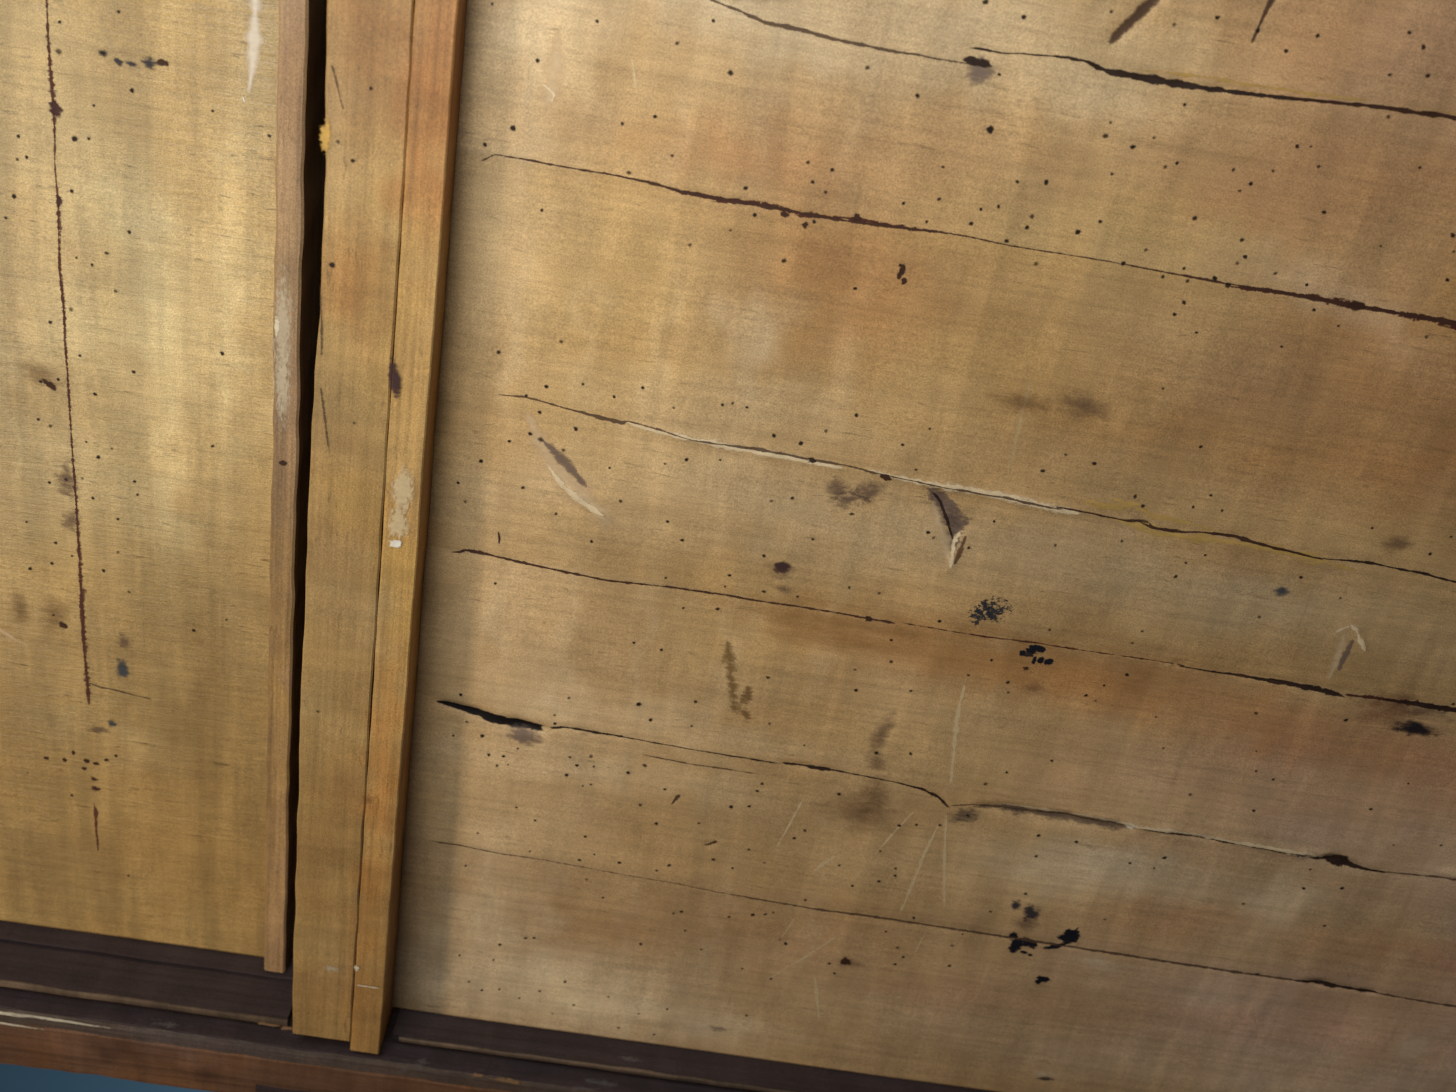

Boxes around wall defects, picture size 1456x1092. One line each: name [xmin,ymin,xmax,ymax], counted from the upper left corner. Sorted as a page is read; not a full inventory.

crack [710,0,1456,121]
crack [478,154,1456,330]
crack [45,0,150,704]
crack [503,395,1456,583]
crack [453,549,1456,712]
crack [91,777,100,851]
crack [437,701,1456,880]
crack [432,841,1456,1007]